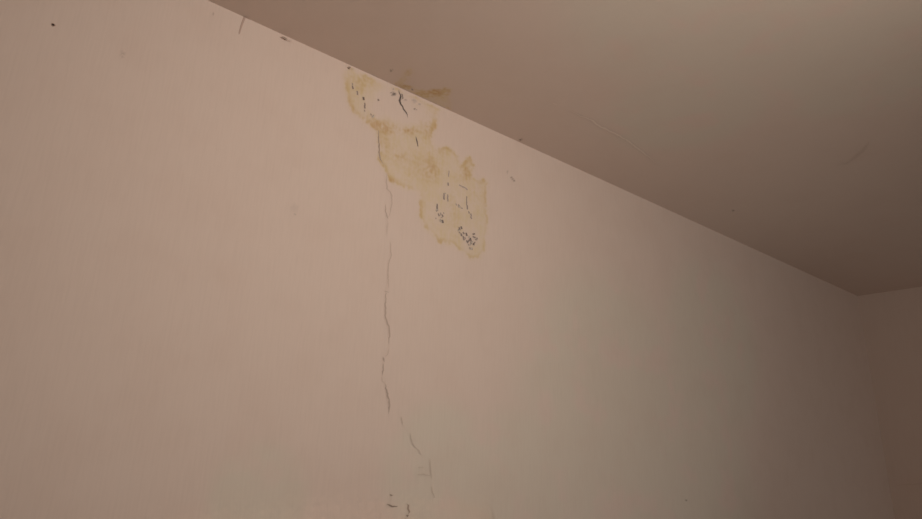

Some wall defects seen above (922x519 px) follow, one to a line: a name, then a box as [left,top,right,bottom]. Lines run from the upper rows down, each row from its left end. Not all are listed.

water stain [340,64,491,263]
crack [378,130,435,498]
crack [387,494,411,519]